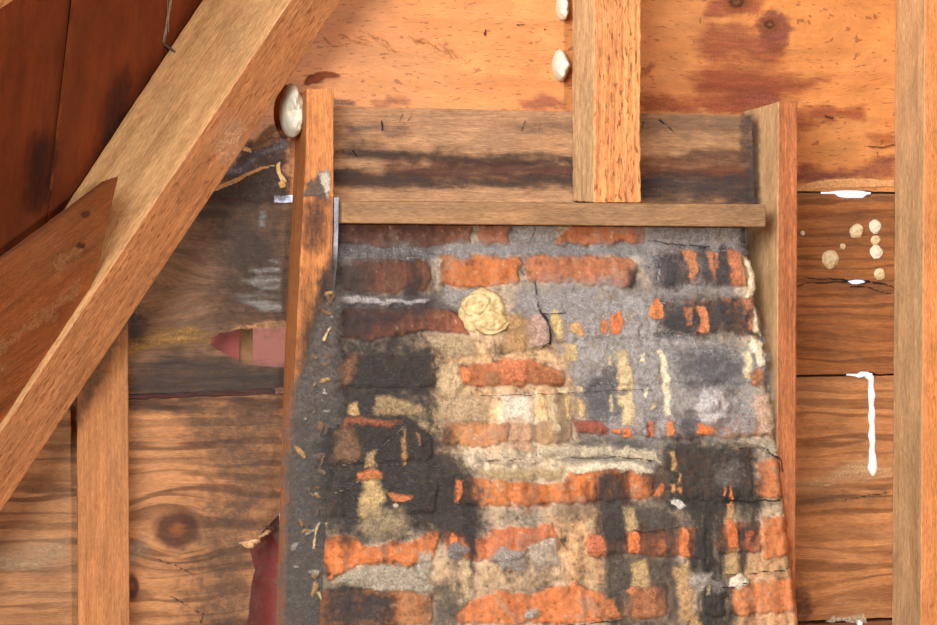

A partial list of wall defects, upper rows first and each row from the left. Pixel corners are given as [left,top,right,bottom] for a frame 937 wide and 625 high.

leakage [701,0,791,61]
leakage [640,71,825,114]
leakage [797,106,863,128]
leakage [797,157,893,182]
crack [797,277,892,294]
crack [535,282,566,351]
leakage [826,614,866,623]